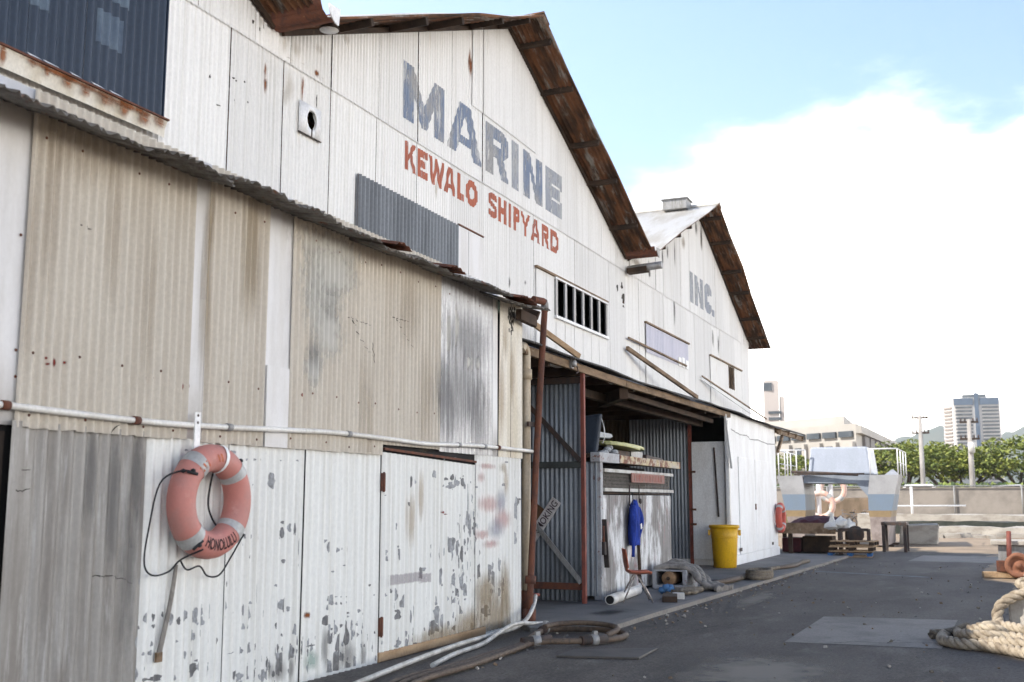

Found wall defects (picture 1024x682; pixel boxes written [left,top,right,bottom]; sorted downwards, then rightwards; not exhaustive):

rust [28,59,164,127]
damp [304,231,360,386]
peeling [279,521,299,567]
peeling [322,470,505,673]
peeling [228,599,314,682]